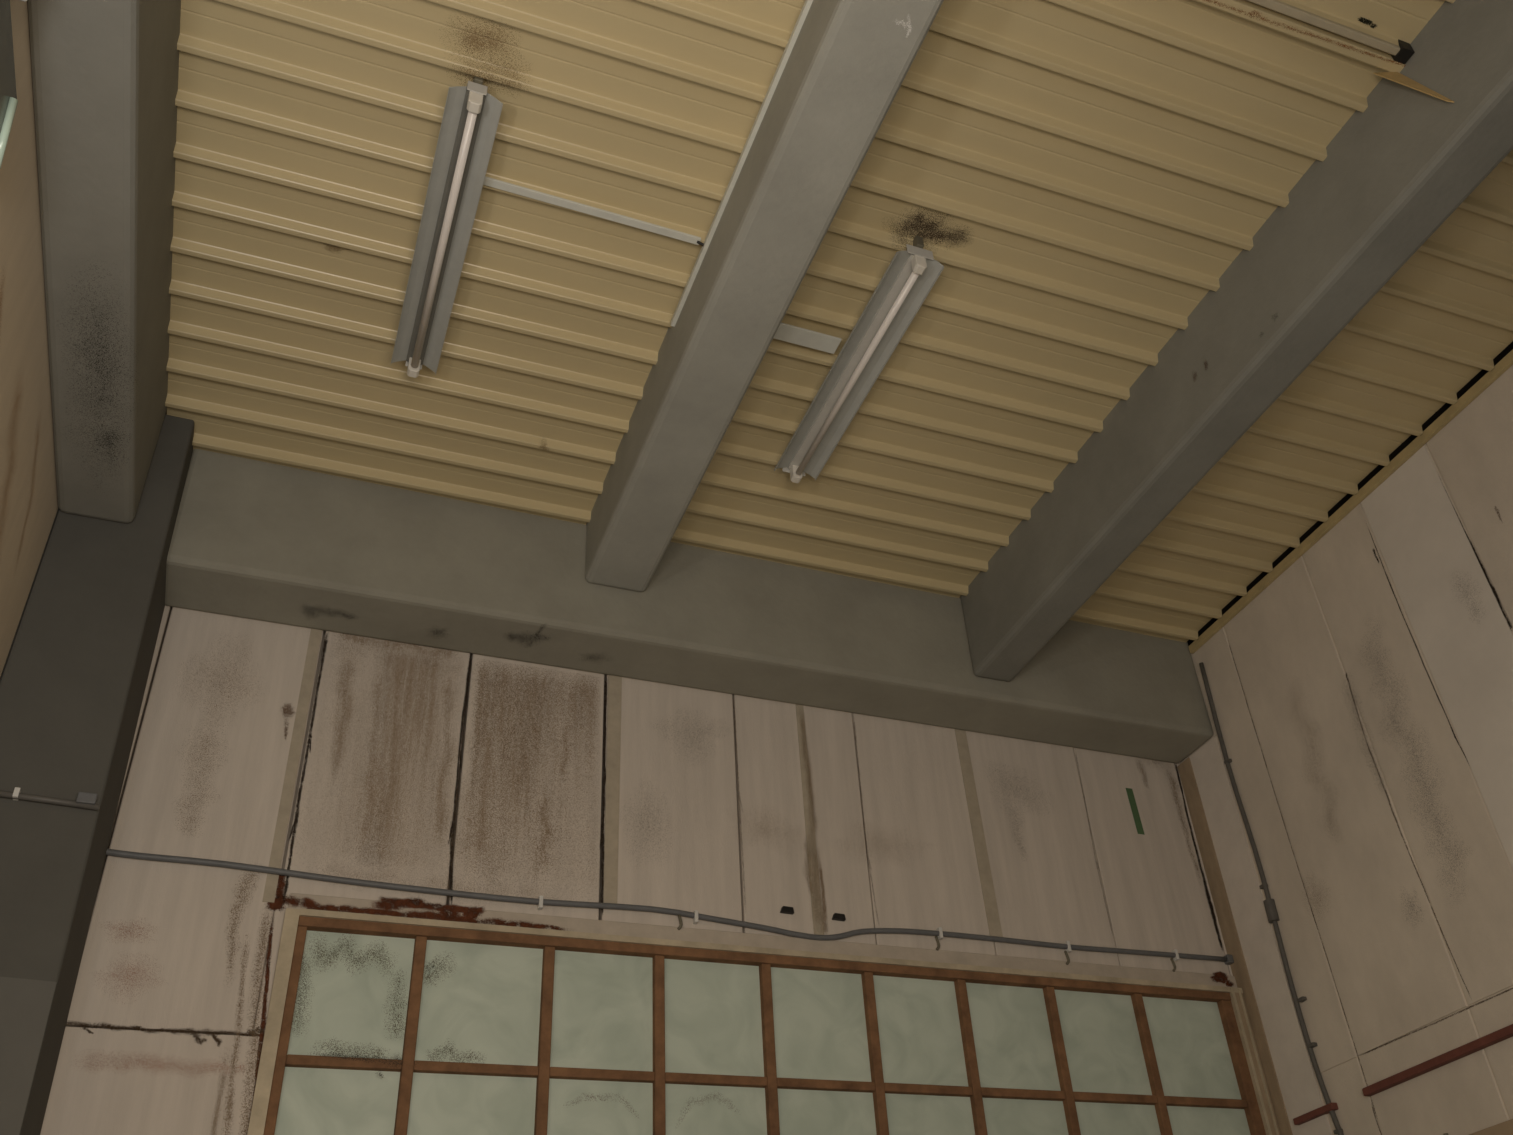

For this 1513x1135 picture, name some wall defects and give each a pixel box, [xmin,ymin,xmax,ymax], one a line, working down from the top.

damp [296,604,609,909]
crack [66,1021,265,1047]
rust [253,875,566,1096]